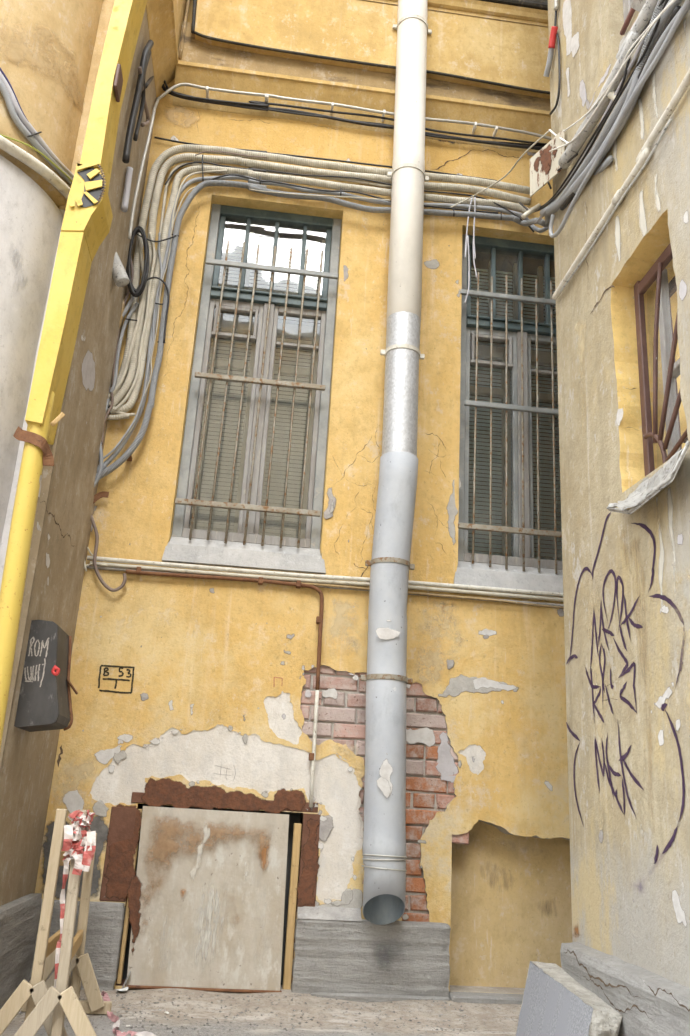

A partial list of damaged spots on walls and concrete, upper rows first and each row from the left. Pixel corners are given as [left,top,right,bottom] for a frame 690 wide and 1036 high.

crack [434,149,519,170]
crack [333,431,379,582]
peeling [376,620,400,640]
flaking render [63,665,393,908]
flaking render [401,660,519,922]
crack [566,950,690,1018]